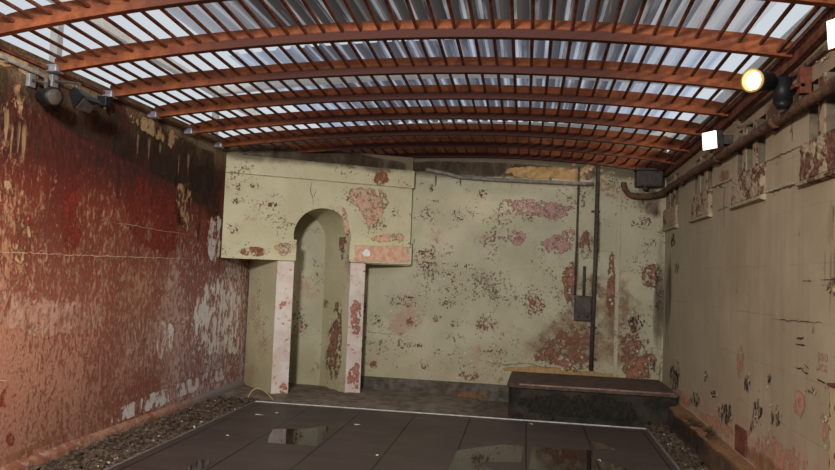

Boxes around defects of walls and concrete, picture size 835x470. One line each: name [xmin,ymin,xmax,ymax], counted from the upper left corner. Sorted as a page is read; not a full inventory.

crack [3,250,203,260]
peeling [339,187,597,381]
peeling [325,297,363,392]
peeling [620,308,657,379]